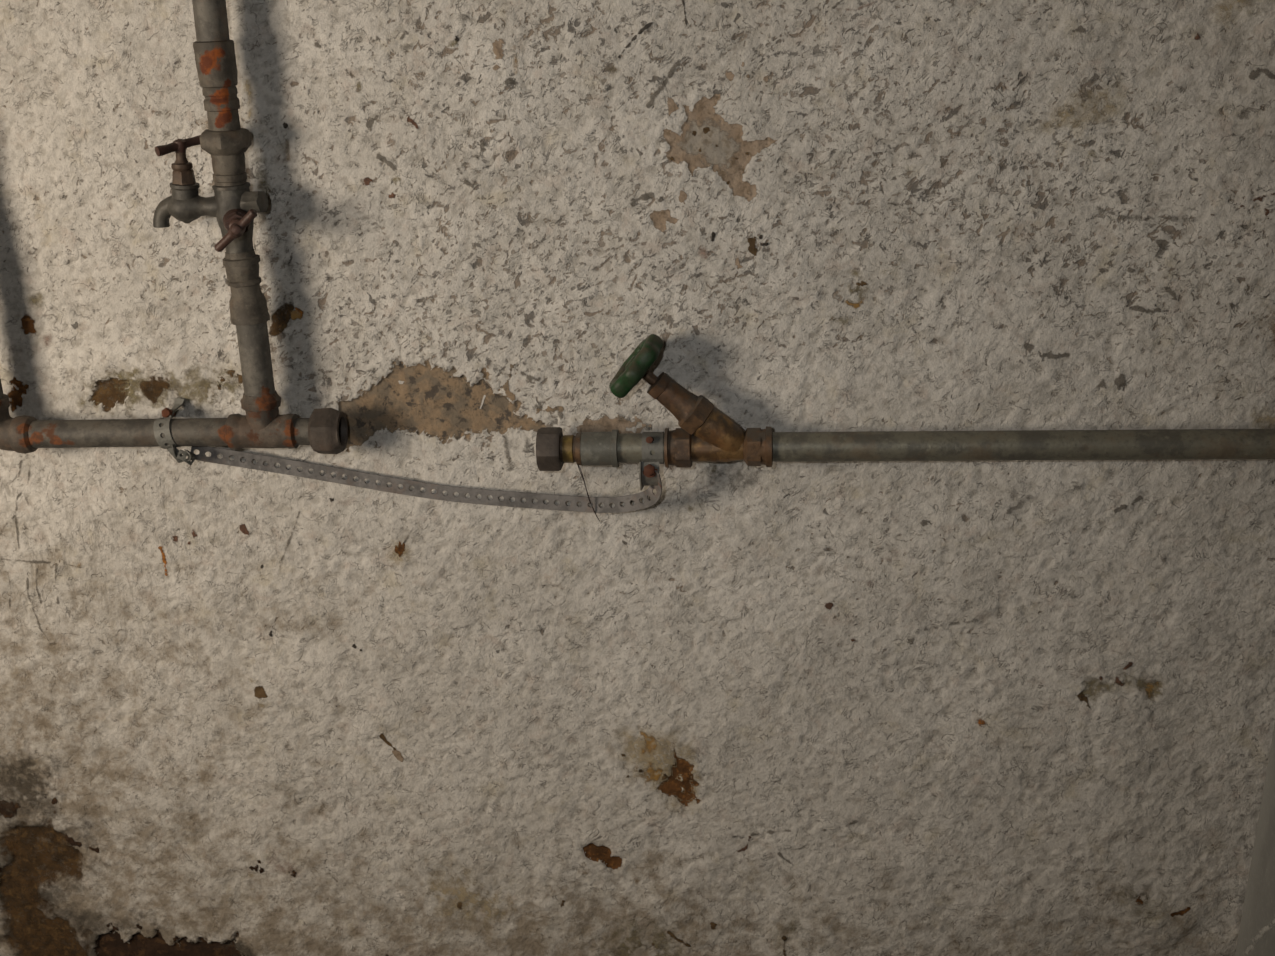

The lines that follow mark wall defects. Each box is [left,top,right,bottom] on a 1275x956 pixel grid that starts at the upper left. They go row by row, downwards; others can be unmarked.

peeling [663,94,777,202]
peeling [631,190,687,232]
spalling [81,369,243,412]
spalling [337,360,564,452]
peeling [576,408,651,433]
corrosion [621,732,700,806]